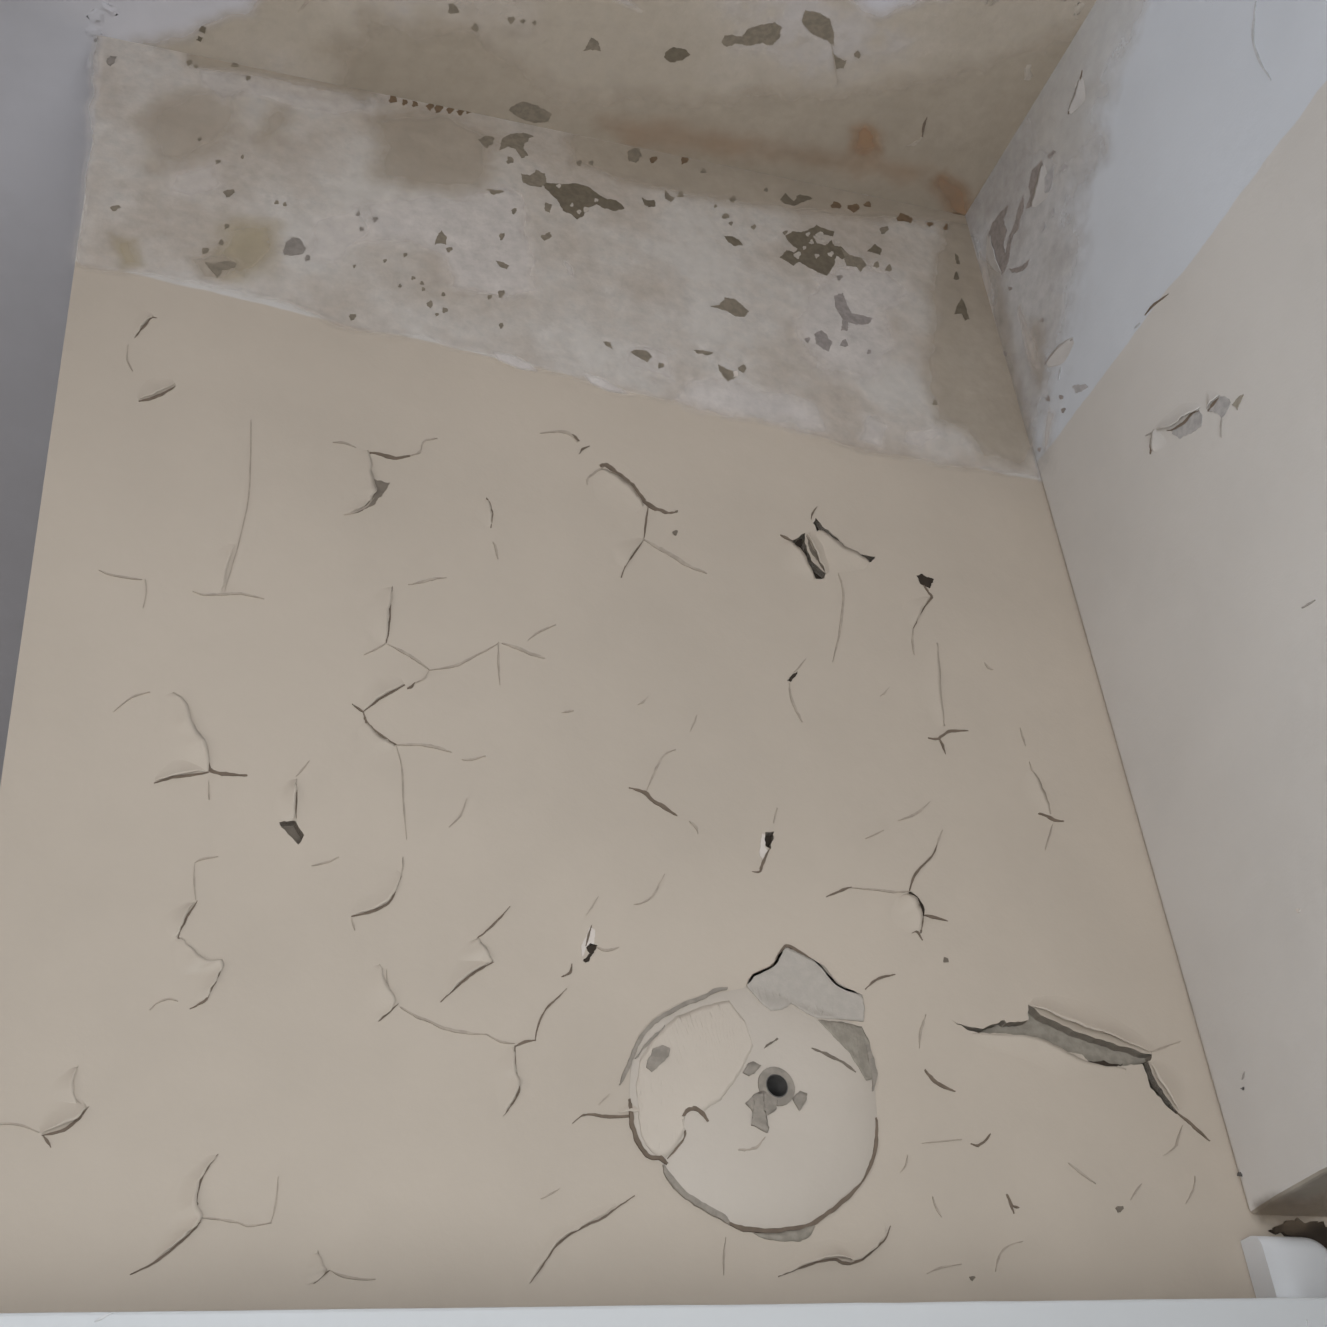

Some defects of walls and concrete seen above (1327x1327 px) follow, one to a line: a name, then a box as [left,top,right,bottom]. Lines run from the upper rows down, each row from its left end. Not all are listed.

peeling [722,22,782,47]
peeling [802,11,861,83]
peeling [478,101,624,219]
water stain [79,0,1097,477]
peeling [711,297,749,317]
peeling [780,212,961,352]
crack [540,430,707,578]
crack [881,574,969,754]
crack [347,577,556,930]
crack [629,715,698,833]
crack [667,1106,709,1159]
peeling [965,996,1210,1155]